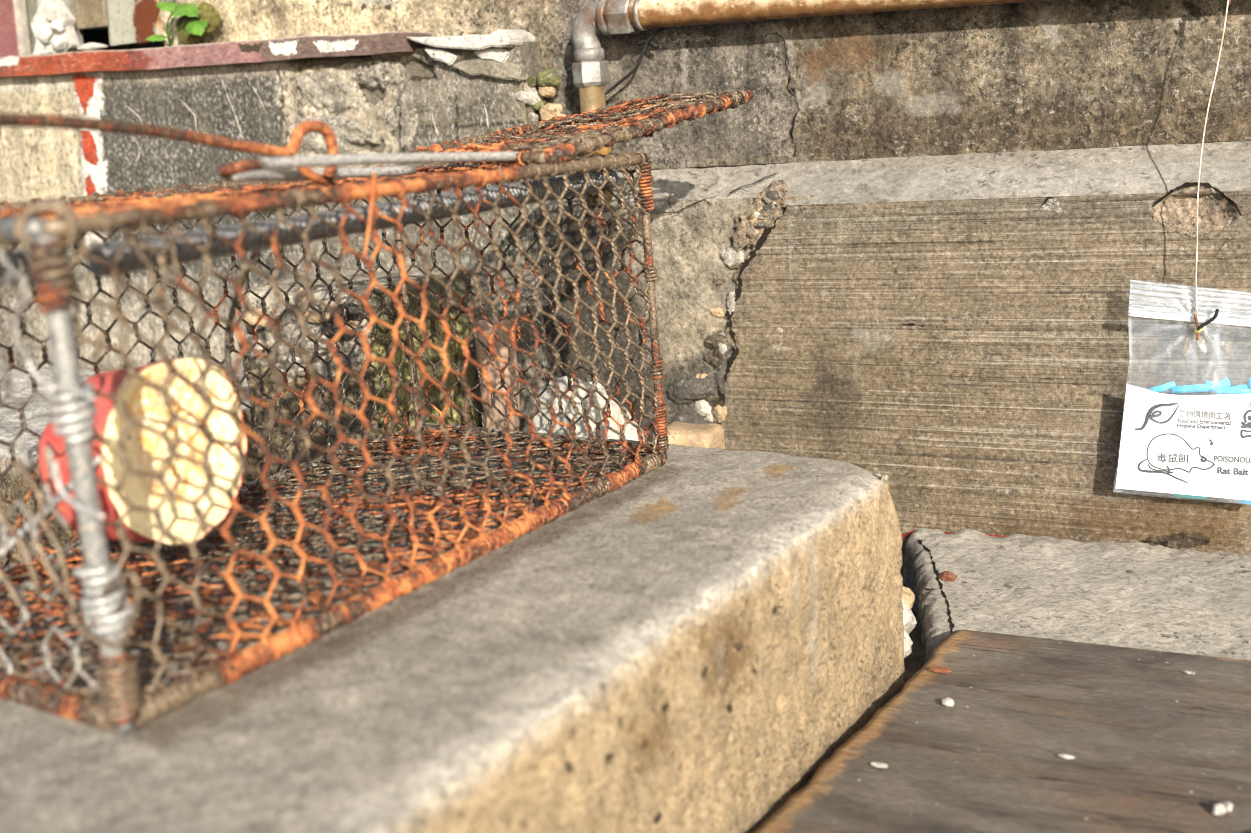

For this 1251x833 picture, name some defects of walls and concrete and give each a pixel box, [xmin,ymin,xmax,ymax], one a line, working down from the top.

peeling [0,55,20,67]
spalling [1153,182,1242,238]
spalling [695,180,788,425]
crack [918,539,955,633]